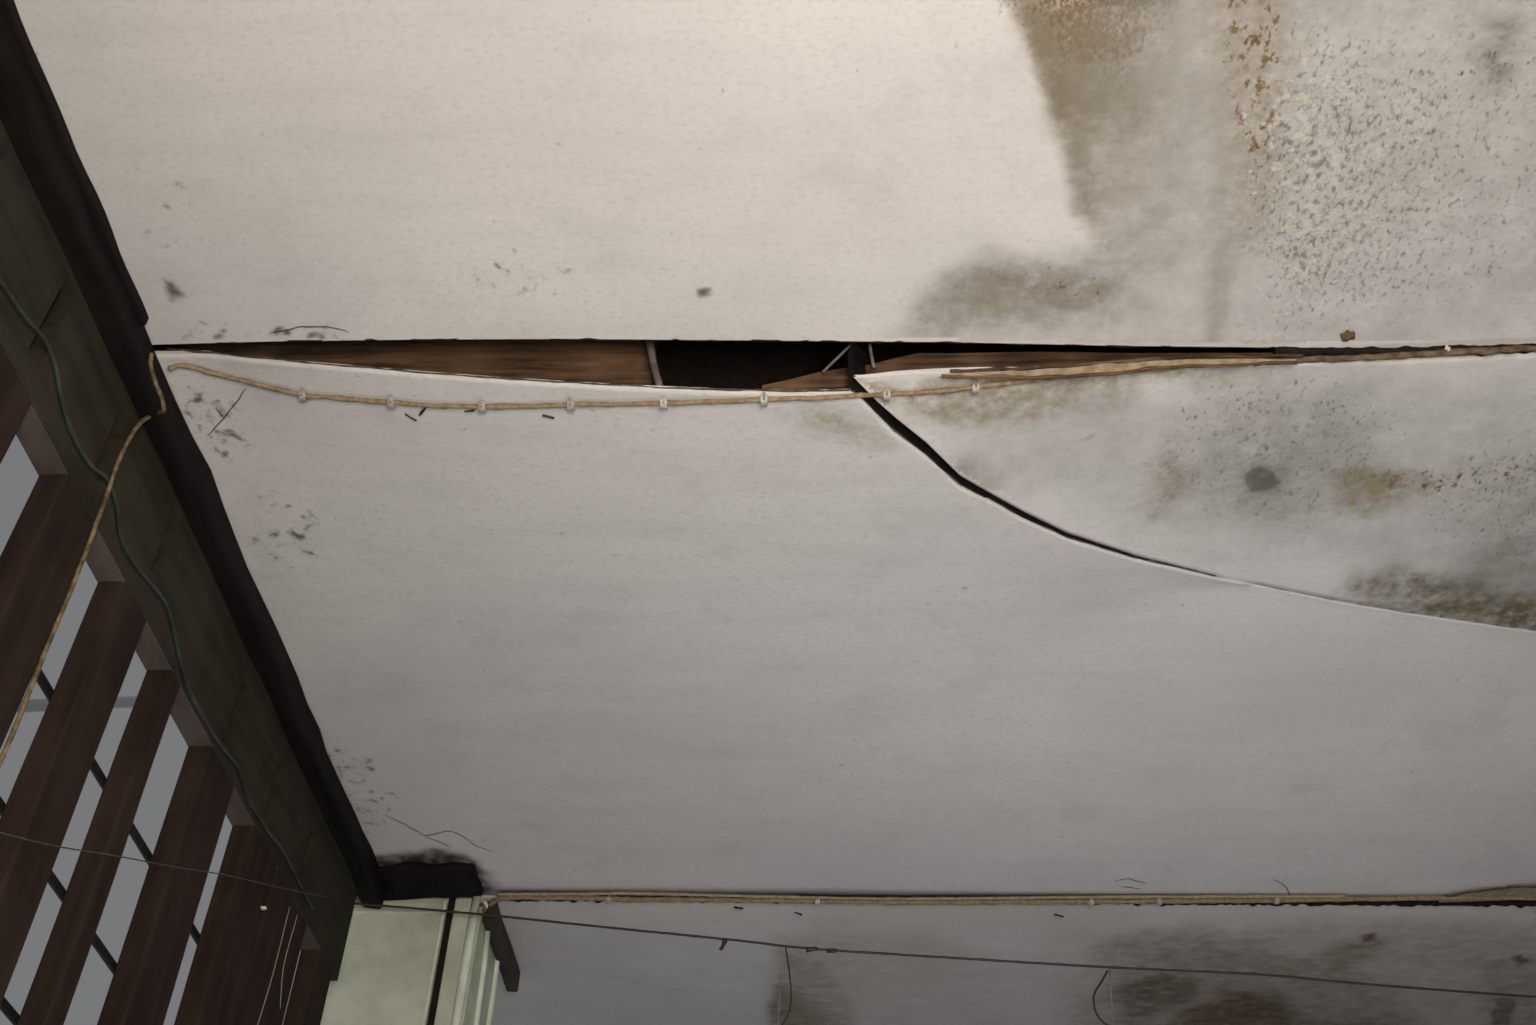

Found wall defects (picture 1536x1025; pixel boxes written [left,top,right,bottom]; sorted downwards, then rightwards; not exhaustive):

water stain [1017,0,1164,185]
water stain [1242,54,1482,343]
crack [166,326,1536,577]
water stain [1356,578,1536,630]